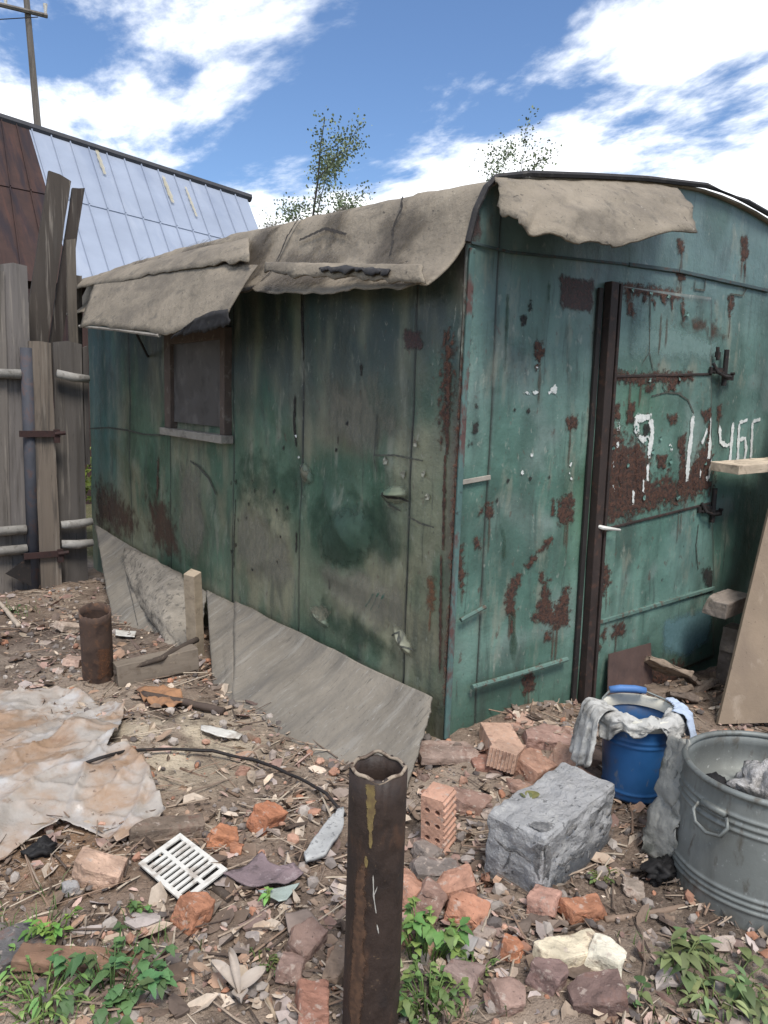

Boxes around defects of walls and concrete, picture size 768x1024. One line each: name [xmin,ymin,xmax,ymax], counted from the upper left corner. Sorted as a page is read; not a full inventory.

corrosion [741,236,749,273]
corrosion [559,274,594,313]
corrosion [619,273,735,349]
corrosion [566,416,578,431]
corrosion [608,369,722,526]
corrosion [95,479,137,538]
corrosion [149,459,179,555]
corrosion [426,326,493,705]
corrosion [504,492,575,657]
corrosion [599,621,626,651]
corrosion [520,673,536,697]